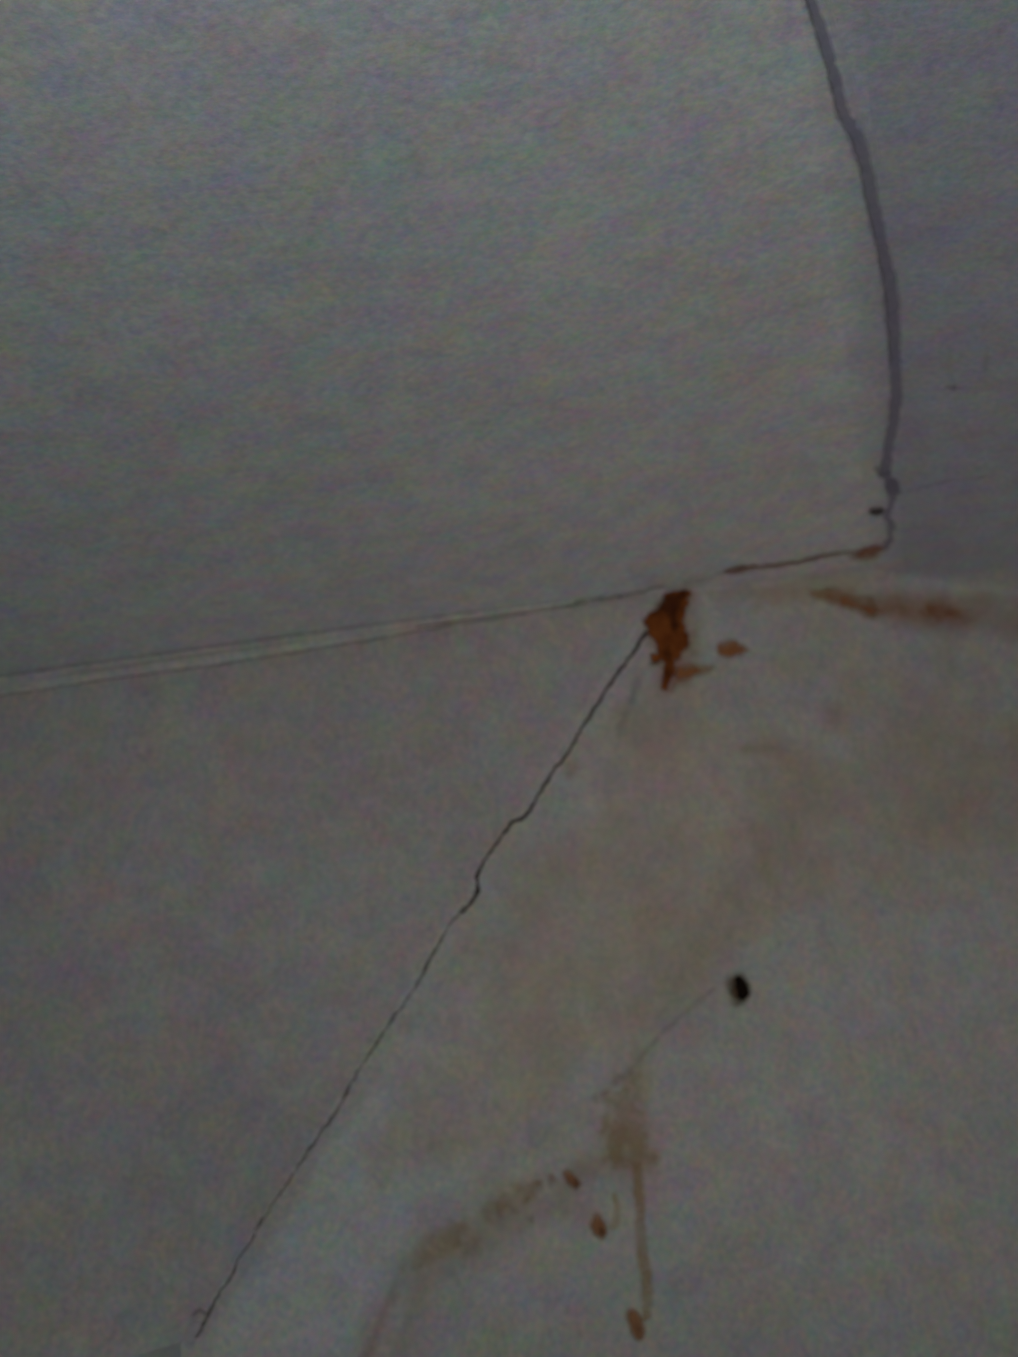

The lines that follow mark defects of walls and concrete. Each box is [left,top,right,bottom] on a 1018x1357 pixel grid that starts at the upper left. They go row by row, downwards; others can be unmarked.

crack [807,0,900,549]
corrosion [644,590,704,691]
corrosion [718,641,747,657]
crack [375,631,648,1043]
crack [189,1086,349,1337]
corrosion [591,1215,607,1238]
corrosion [628,1310,648,1339]